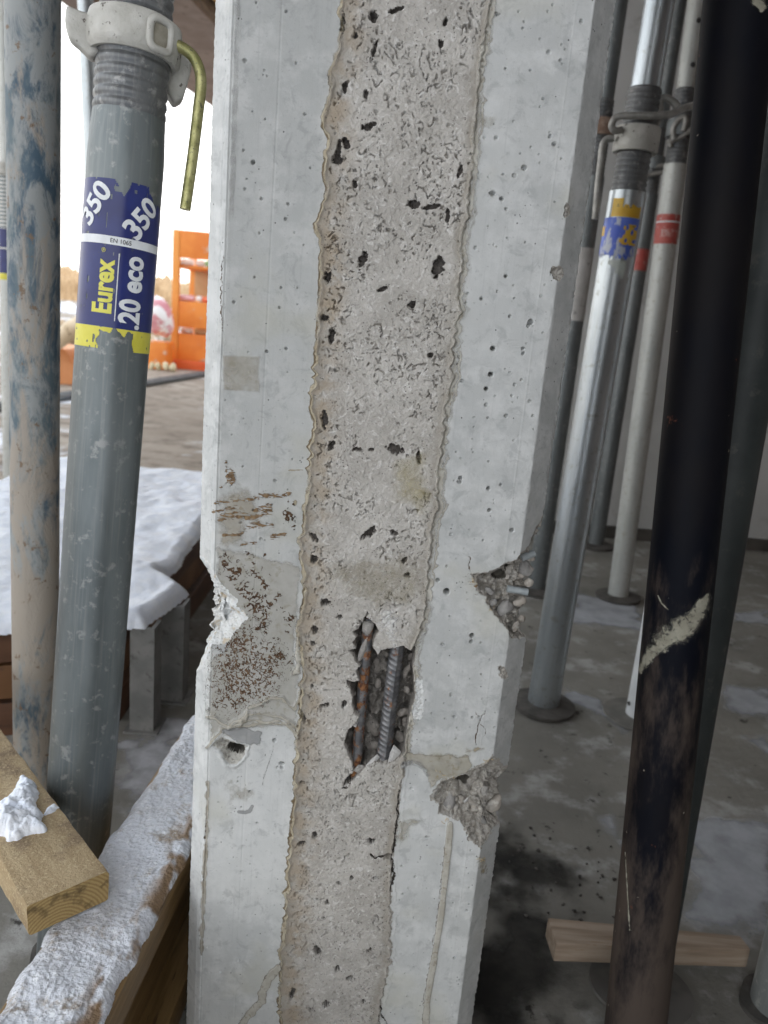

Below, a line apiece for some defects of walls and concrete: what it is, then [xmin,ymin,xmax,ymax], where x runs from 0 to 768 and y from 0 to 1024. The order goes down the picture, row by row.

corrosion [212,460,297,546]
spalling [197,556,249,671]
spalling [470,515,543,640]
spalling [344,612,416,785]
crack [370,790,400,892]
spalling [429,754,508,862]